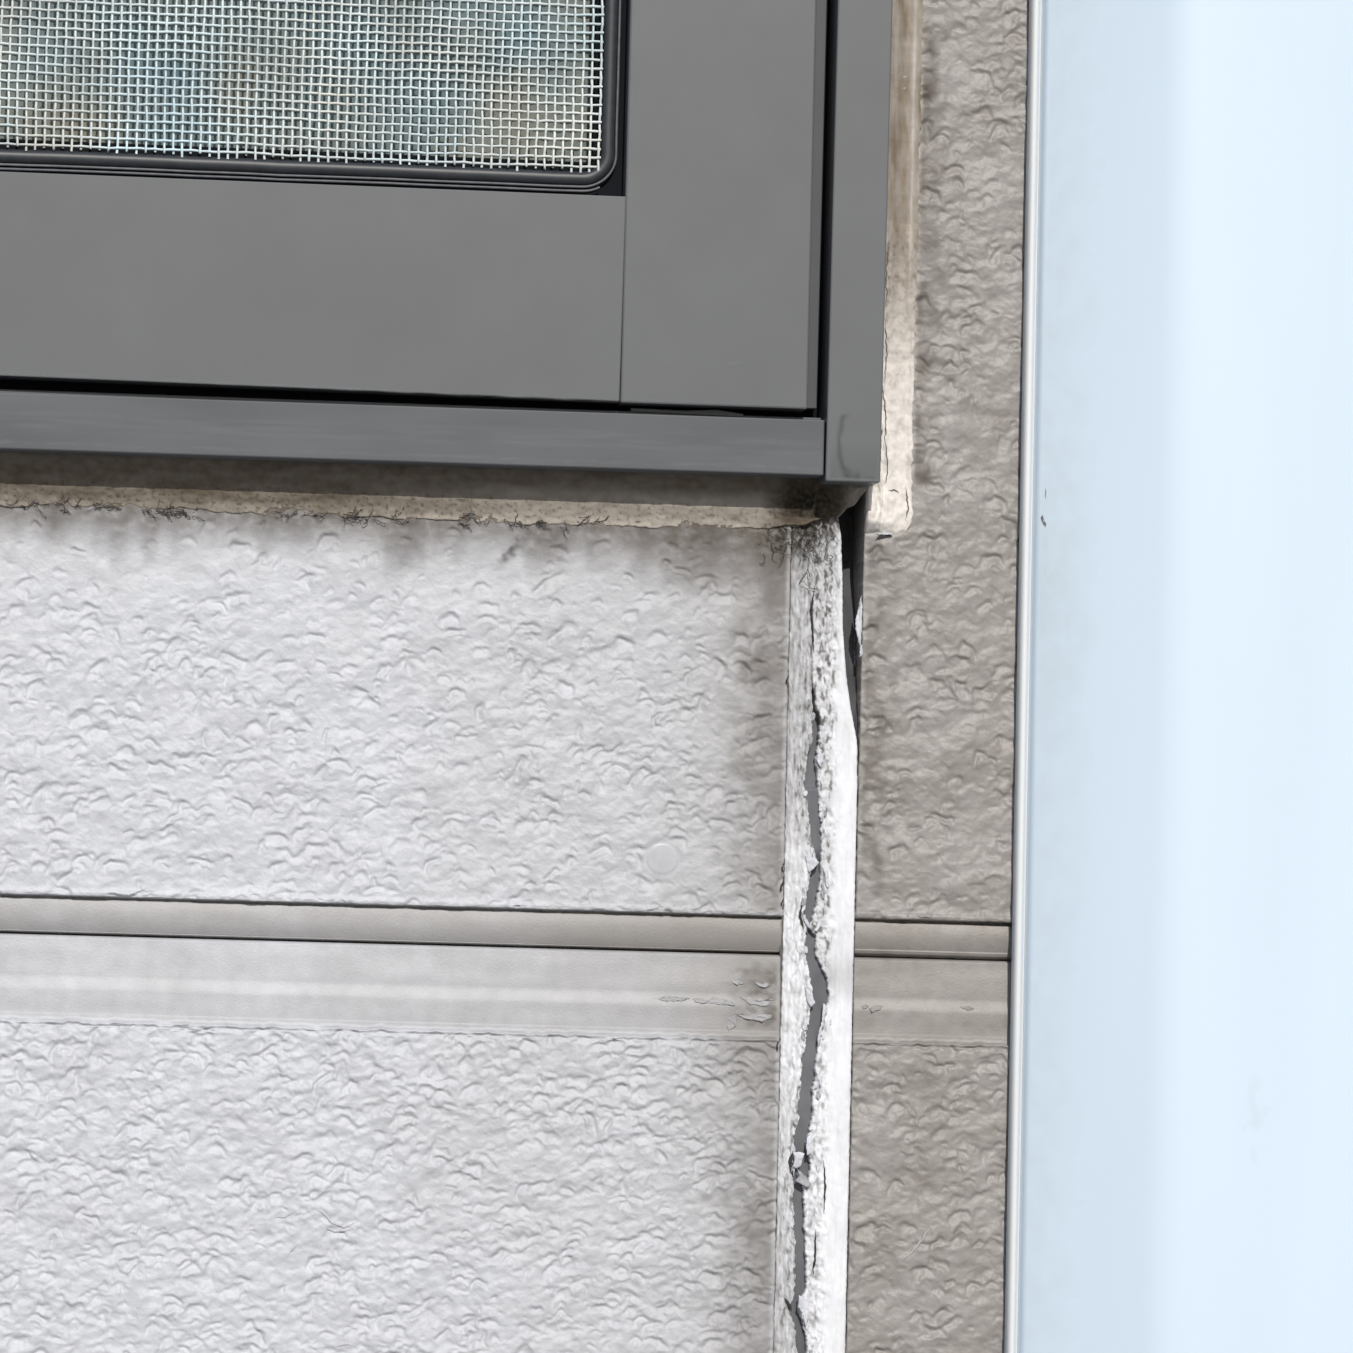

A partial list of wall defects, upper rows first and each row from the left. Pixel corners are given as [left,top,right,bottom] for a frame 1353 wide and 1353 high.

water stain [639,487,831,547]
crack [773,244,909,1353]
peeling [655,979,775,1031]